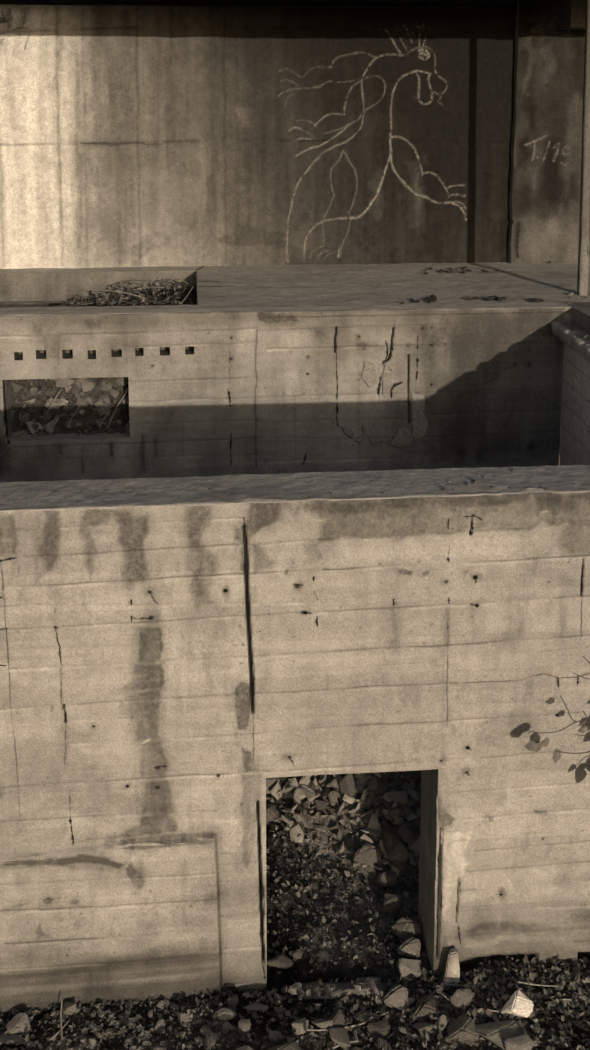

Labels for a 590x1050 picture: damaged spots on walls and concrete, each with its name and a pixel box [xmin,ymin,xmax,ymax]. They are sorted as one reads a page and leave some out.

crack [332,328,340,427]
peeling [341,392,428,448]
crack [377,329,426,439]
water stain [41,515,59,567]
water stain [85,511,148,579]
water stain [188,506,208,598]
crack [243,518,254,709]
water stain [140,628,163,717]
water stain [121,783,213,849]
water stain [4,854,141,887]
crack [256,801,266,979]